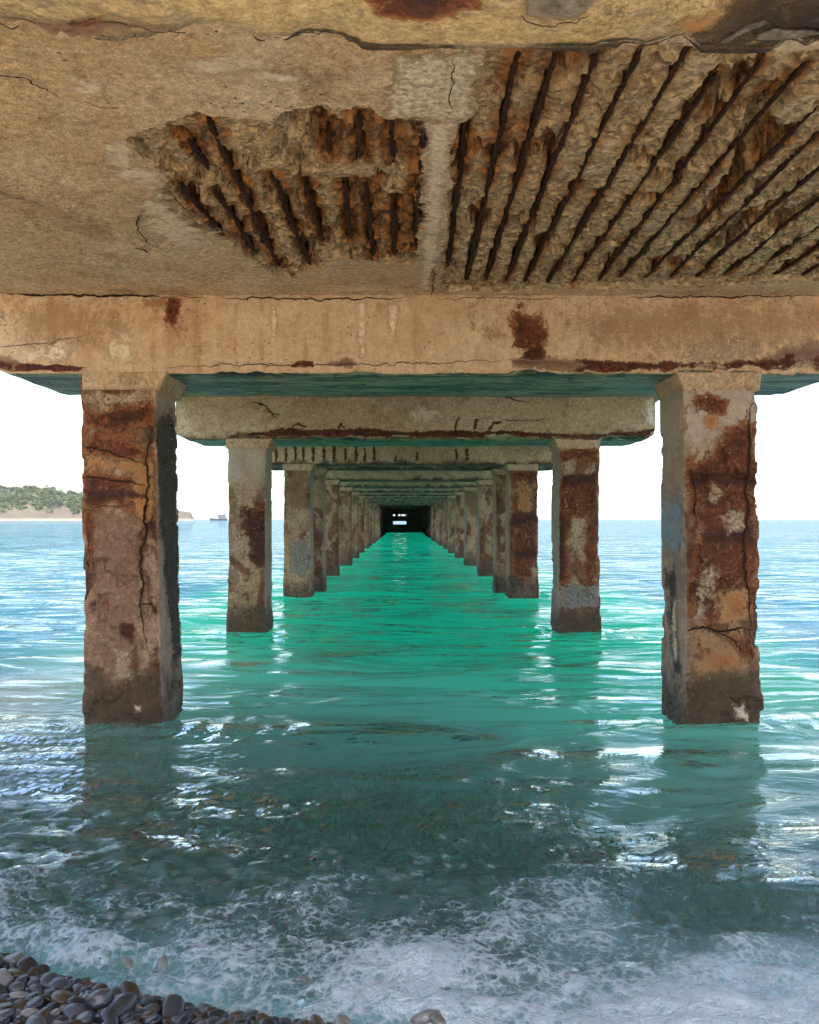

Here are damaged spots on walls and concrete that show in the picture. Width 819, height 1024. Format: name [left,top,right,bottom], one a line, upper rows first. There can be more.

spalling [254,30,464,51]
rust [365,0,483,23]
spalling [98,105,433,278]
spalling [433,0,819,293]
crack [0,267,568,321]
rust [508,299,586,373]
crack [81,426,154,653]
rust [81,392,158,573]
rust [229,497,265,572]
rust [559,447,600,592]
crack [687,397,757,656]
rust [684,391,760,677]